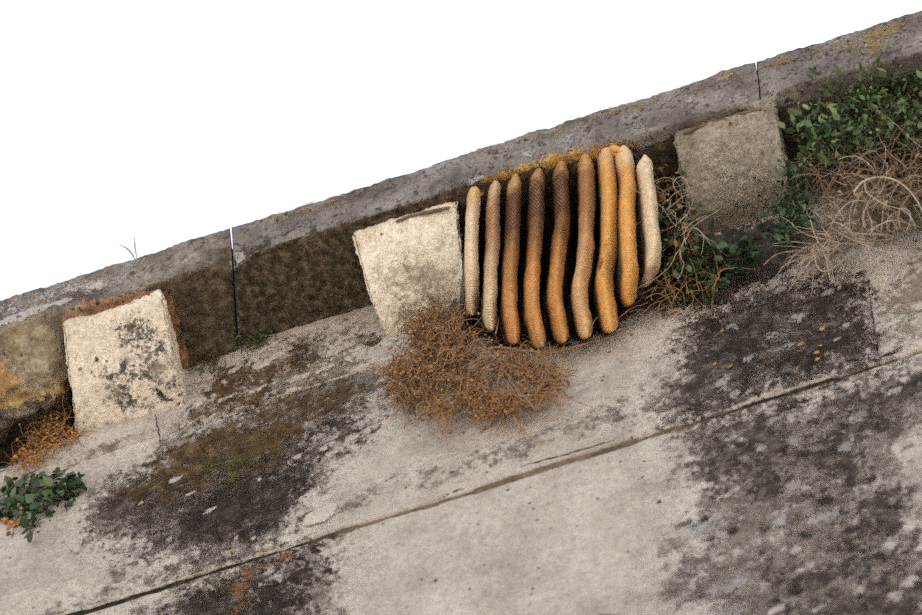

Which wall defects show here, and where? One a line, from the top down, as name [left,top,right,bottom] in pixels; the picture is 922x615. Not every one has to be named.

leakage [777,73,922,173]
leakage [42,139,922,615]
leakage [0,389,76,468]